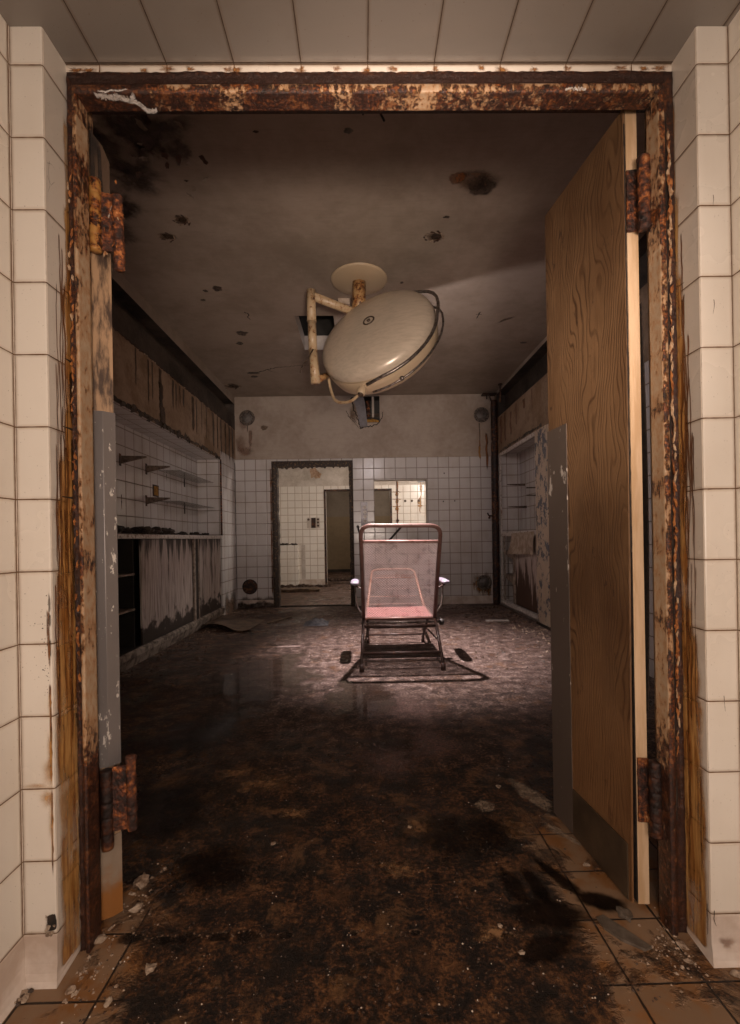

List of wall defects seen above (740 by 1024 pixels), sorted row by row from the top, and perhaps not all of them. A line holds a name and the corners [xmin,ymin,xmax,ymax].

damp [93,89,213,227]
damp [450,171,496,195]
corrosion [45,125,81,965]
damp [113,348,274,614]
corrosion [674,163,706,947]